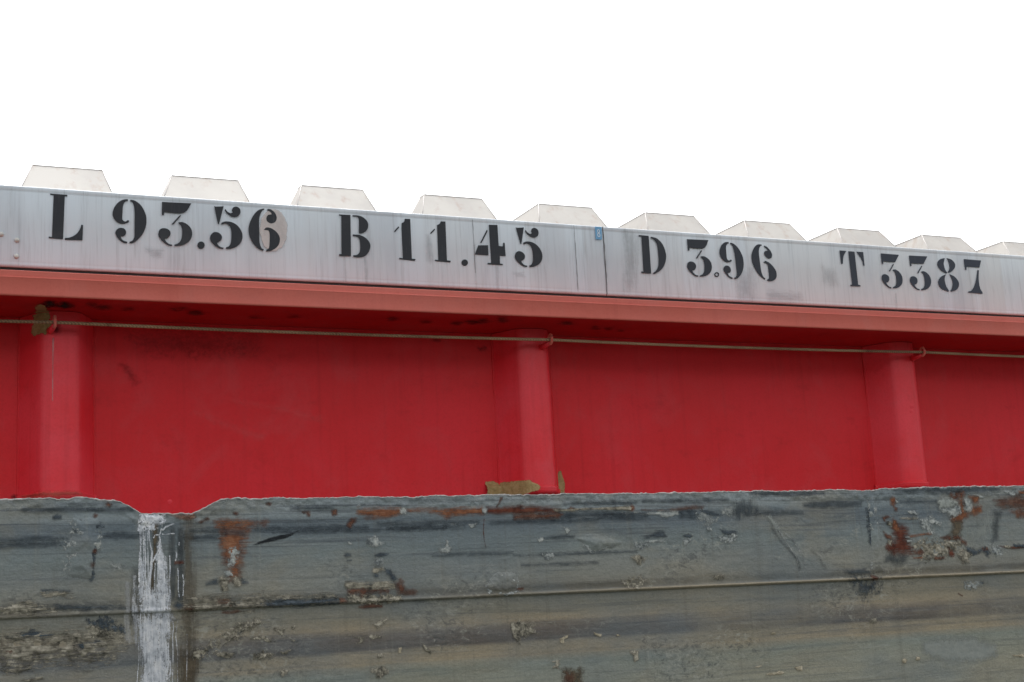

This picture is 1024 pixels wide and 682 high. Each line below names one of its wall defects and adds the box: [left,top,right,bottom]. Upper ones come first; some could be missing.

rust [200,512,264,582]
rust [347,497,634,528]
peeling [485,480,540,495]
rust [882,491,1024,562]
leakage [27,507,222,682]
peeling [182,535,415,660]
peeling [0,589,129,681]